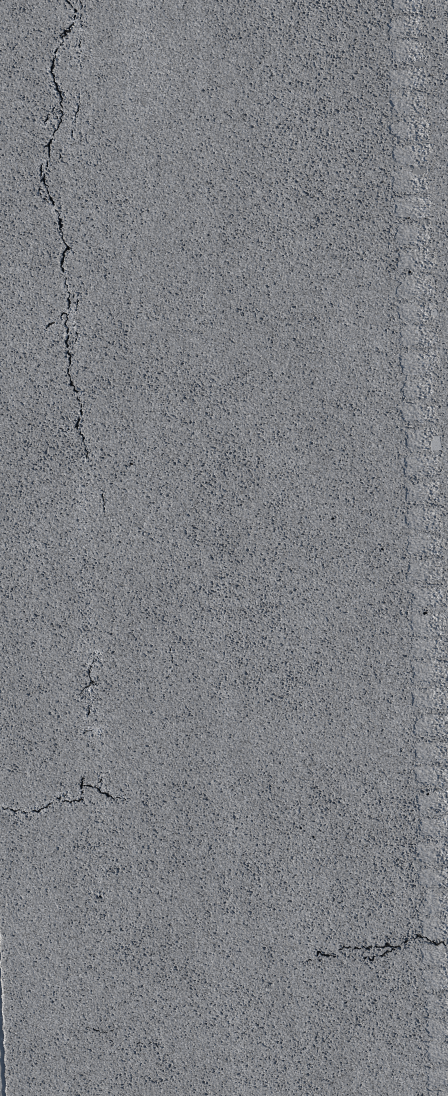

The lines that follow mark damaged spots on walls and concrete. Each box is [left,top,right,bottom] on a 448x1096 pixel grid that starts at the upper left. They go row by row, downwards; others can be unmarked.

crack [39,0,88,457]
crack [3,777,126,823]
crack [309,934,446,961]